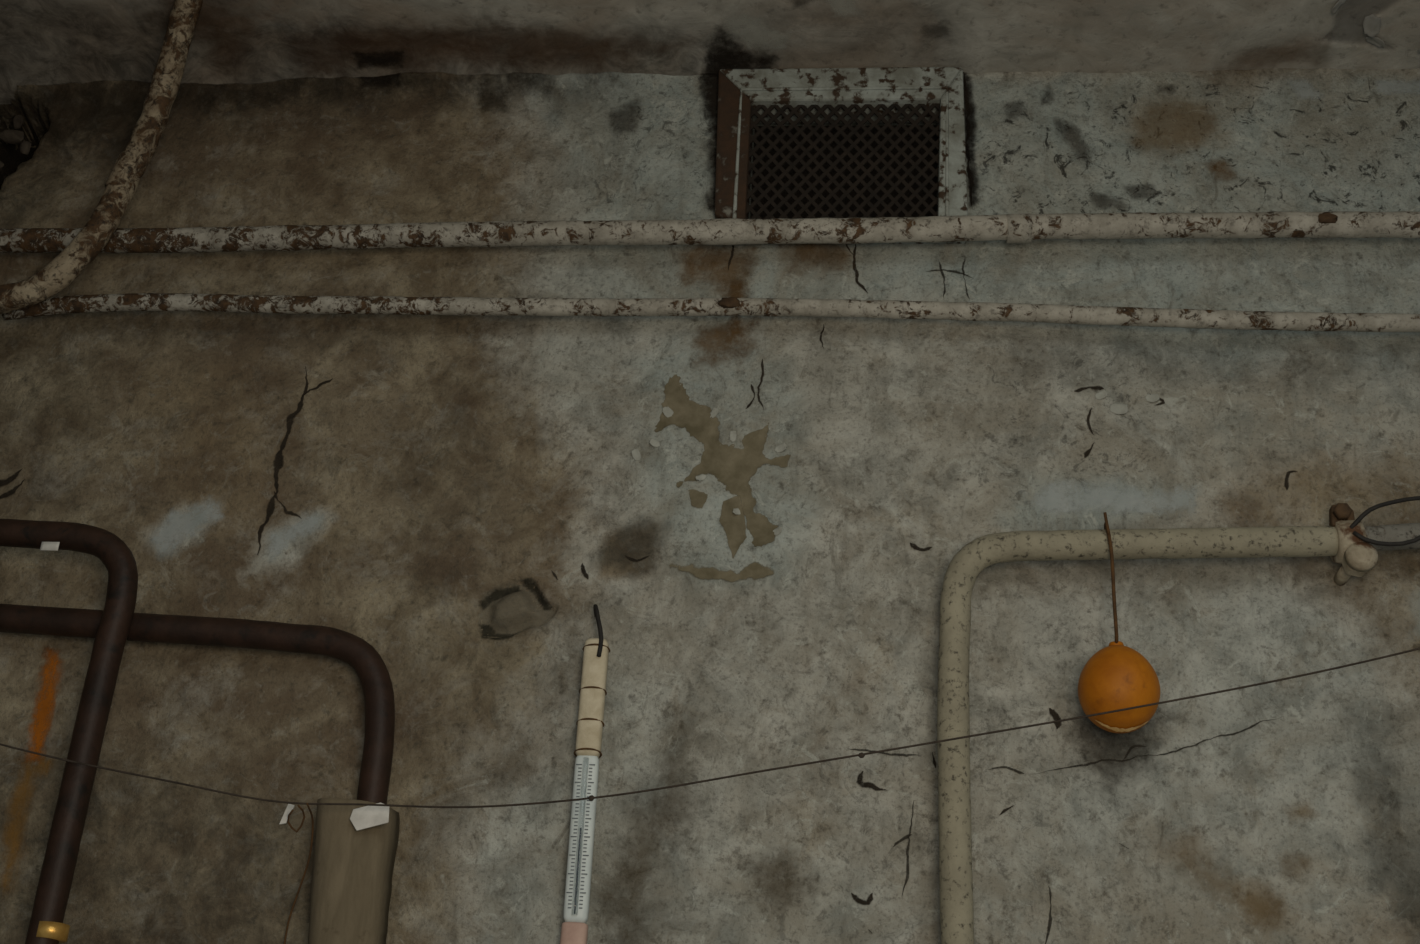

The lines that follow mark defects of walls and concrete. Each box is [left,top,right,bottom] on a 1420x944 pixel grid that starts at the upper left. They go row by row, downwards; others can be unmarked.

crack [257,366,333,555]
peeling [631,374,791,582]
rust [4,650,58,884]